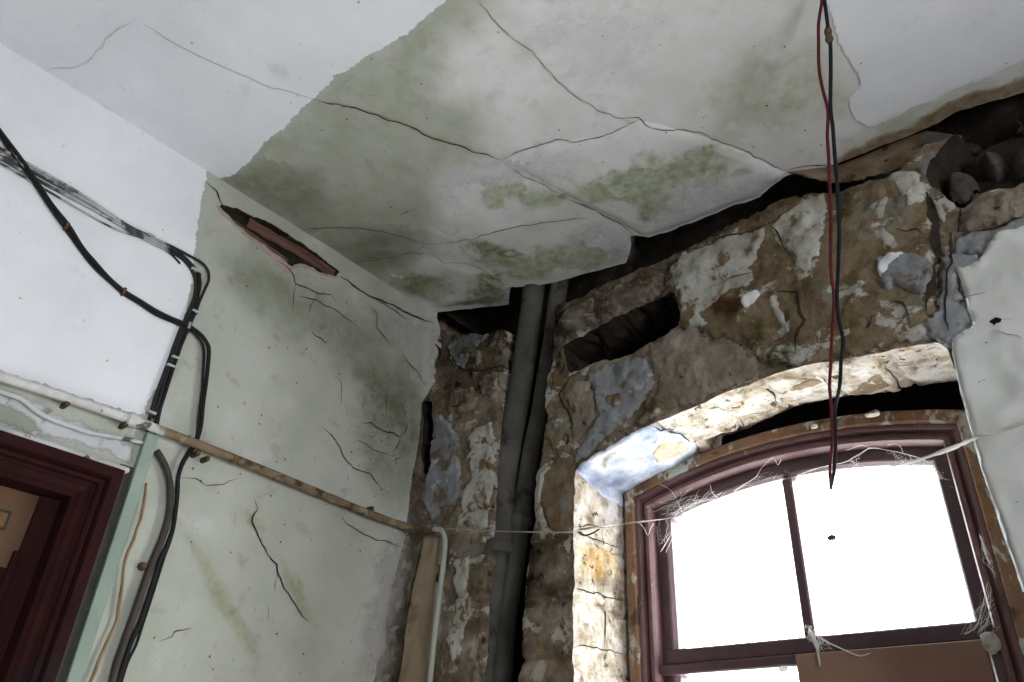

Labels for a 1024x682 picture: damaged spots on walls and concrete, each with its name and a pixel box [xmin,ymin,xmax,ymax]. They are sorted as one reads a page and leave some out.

flaking render [216,206,341,278]
crack [47,4,832,428]
peeling [0,394,132,462]
crack [322,377,413,490]
flaking render [423,333,510,529]
crack [653,426,691,443]
flaking render [534,131,1024,592]
crack [882,363,912,390]
crack [251,499,310,622]
crack [343,519,422,670]
flaking render [446,557,470,662]